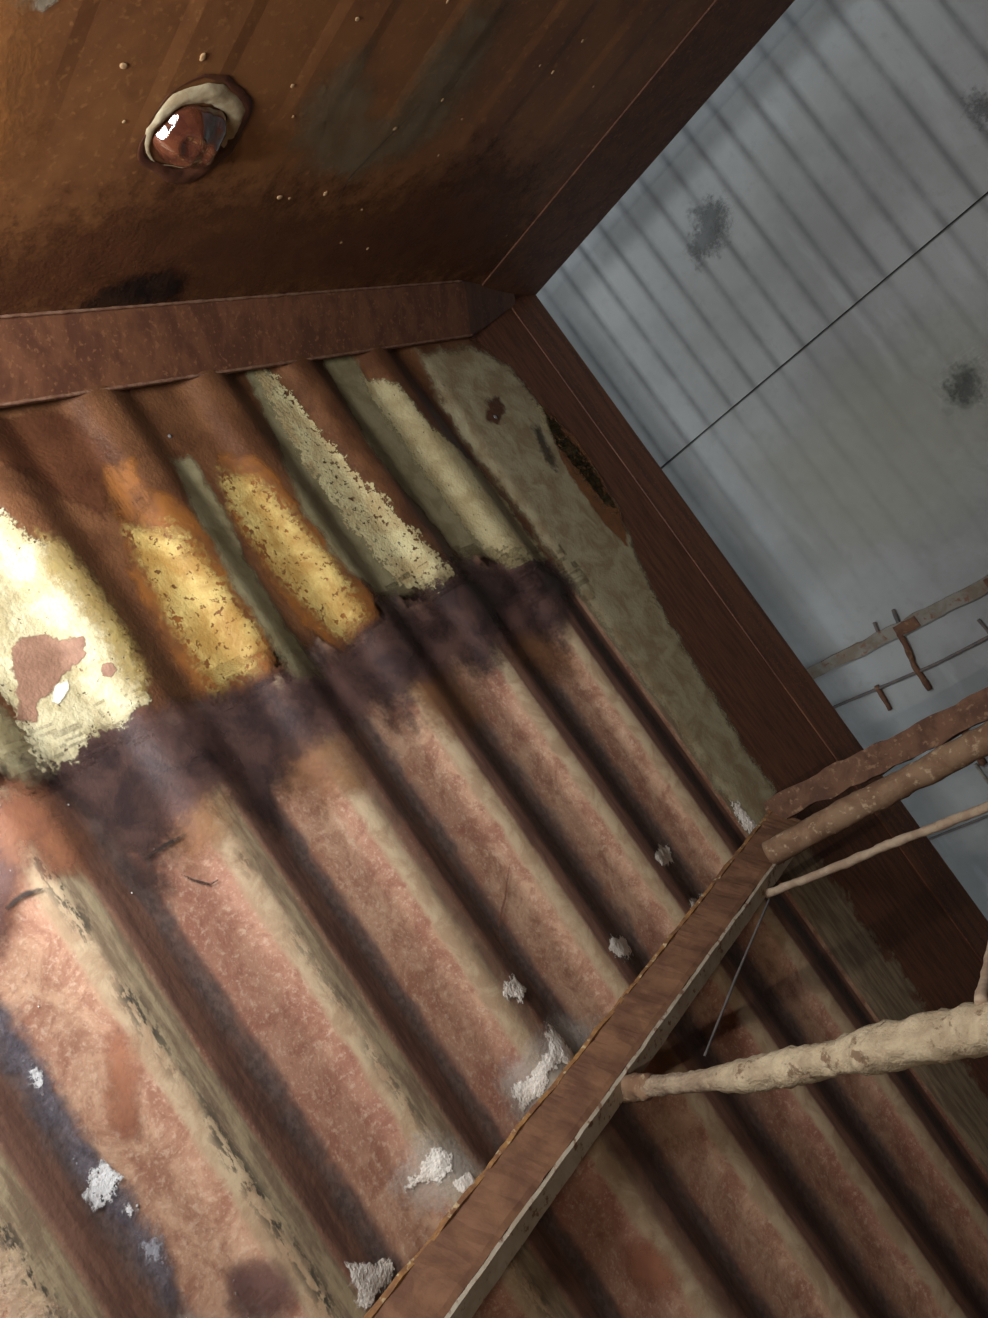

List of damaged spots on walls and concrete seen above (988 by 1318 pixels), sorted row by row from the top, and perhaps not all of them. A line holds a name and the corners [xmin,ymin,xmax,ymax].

rust [137,74,253,184]
leakage [689,196,727,259]
peeling [0,508,152,785]
rust [0,337,581,934]
leakage [36,560,573,897]
peeling [124,346,776,825]
rust [363,810,772,1318]
peeling [0,1262,42,1318]